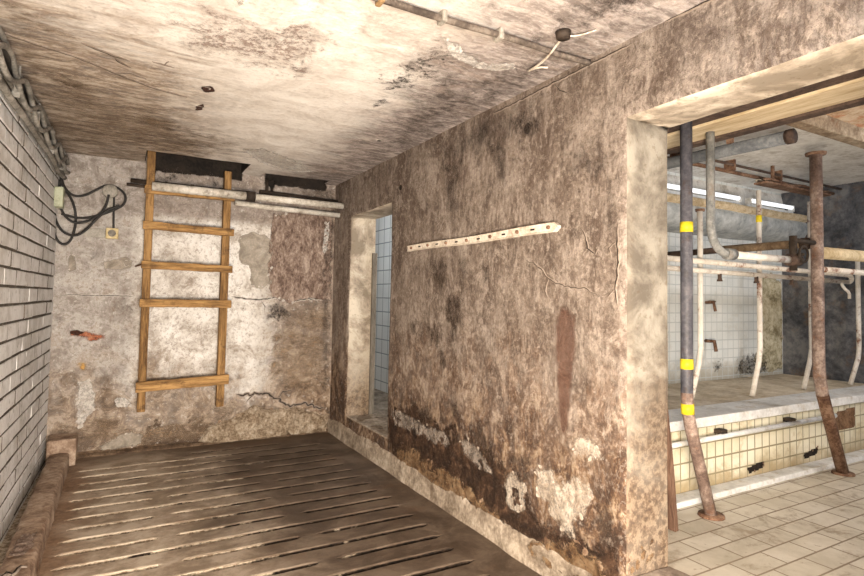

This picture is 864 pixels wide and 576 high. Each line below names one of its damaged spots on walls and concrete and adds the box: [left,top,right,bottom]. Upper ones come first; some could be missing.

leakage [189,10,314,73]
spalling [237,212,332,304]
rust [70,330,103,341]
crack [236,390,325,410]
leakage [387,403,619,576]